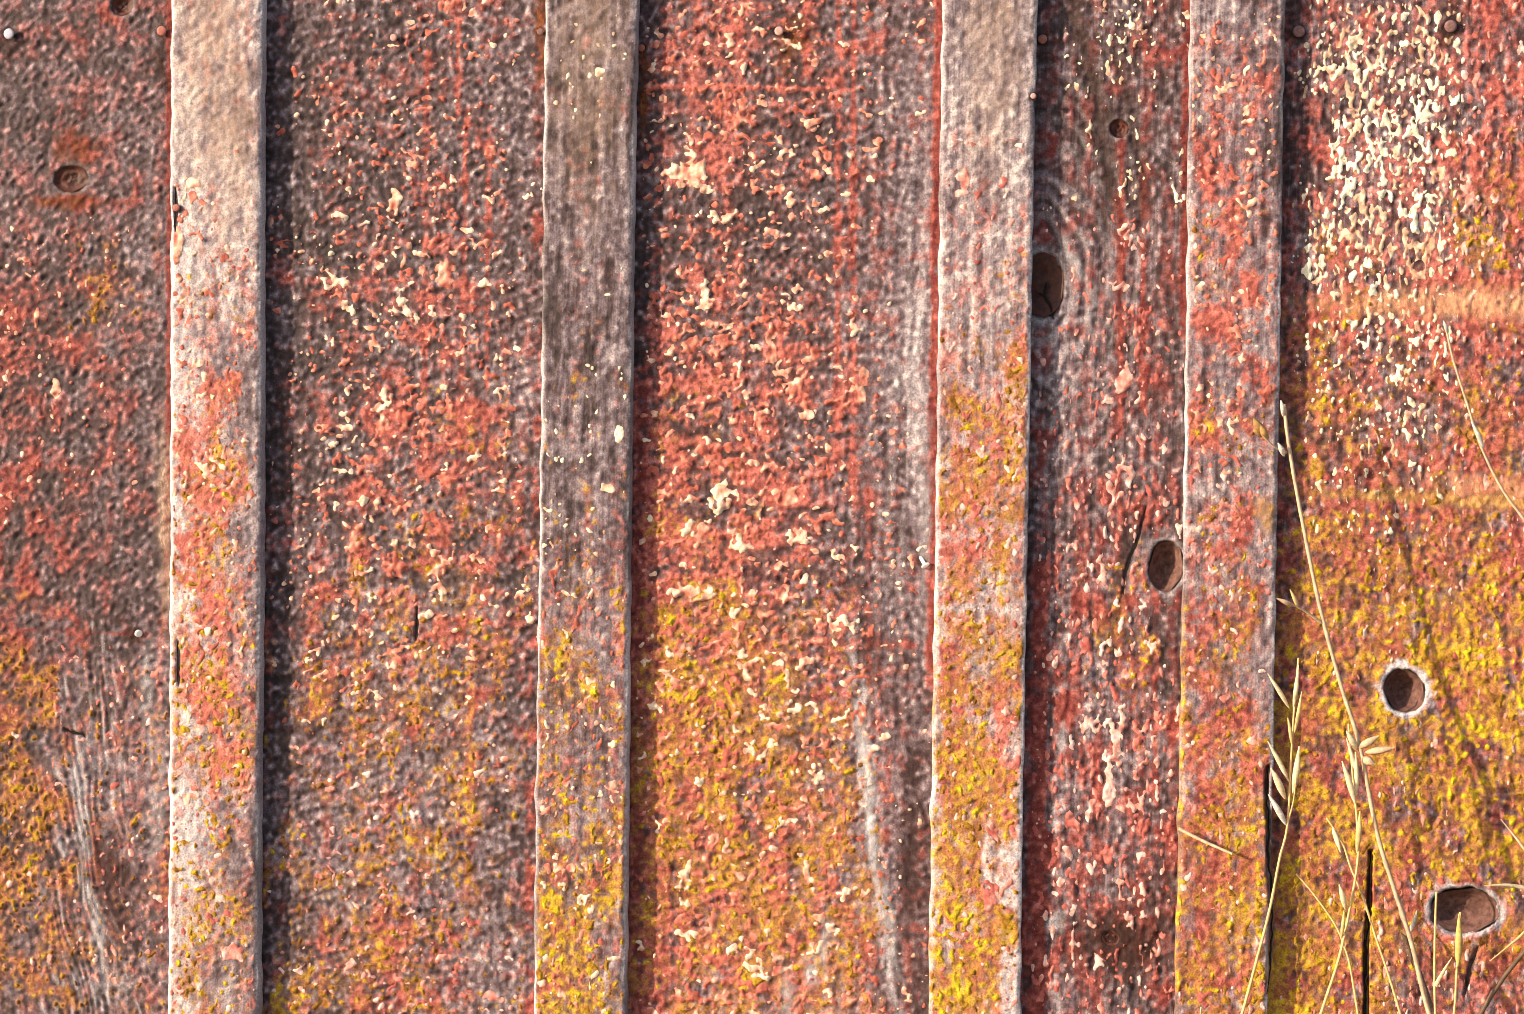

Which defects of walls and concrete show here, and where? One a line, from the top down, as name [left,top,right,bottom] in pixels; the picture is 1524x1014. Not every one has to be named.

peeling [0,0,627,1014]
peeling [582,0,1524,1014]
crack [1266,766,1275,994]
crack [1364,851,1372,1014]